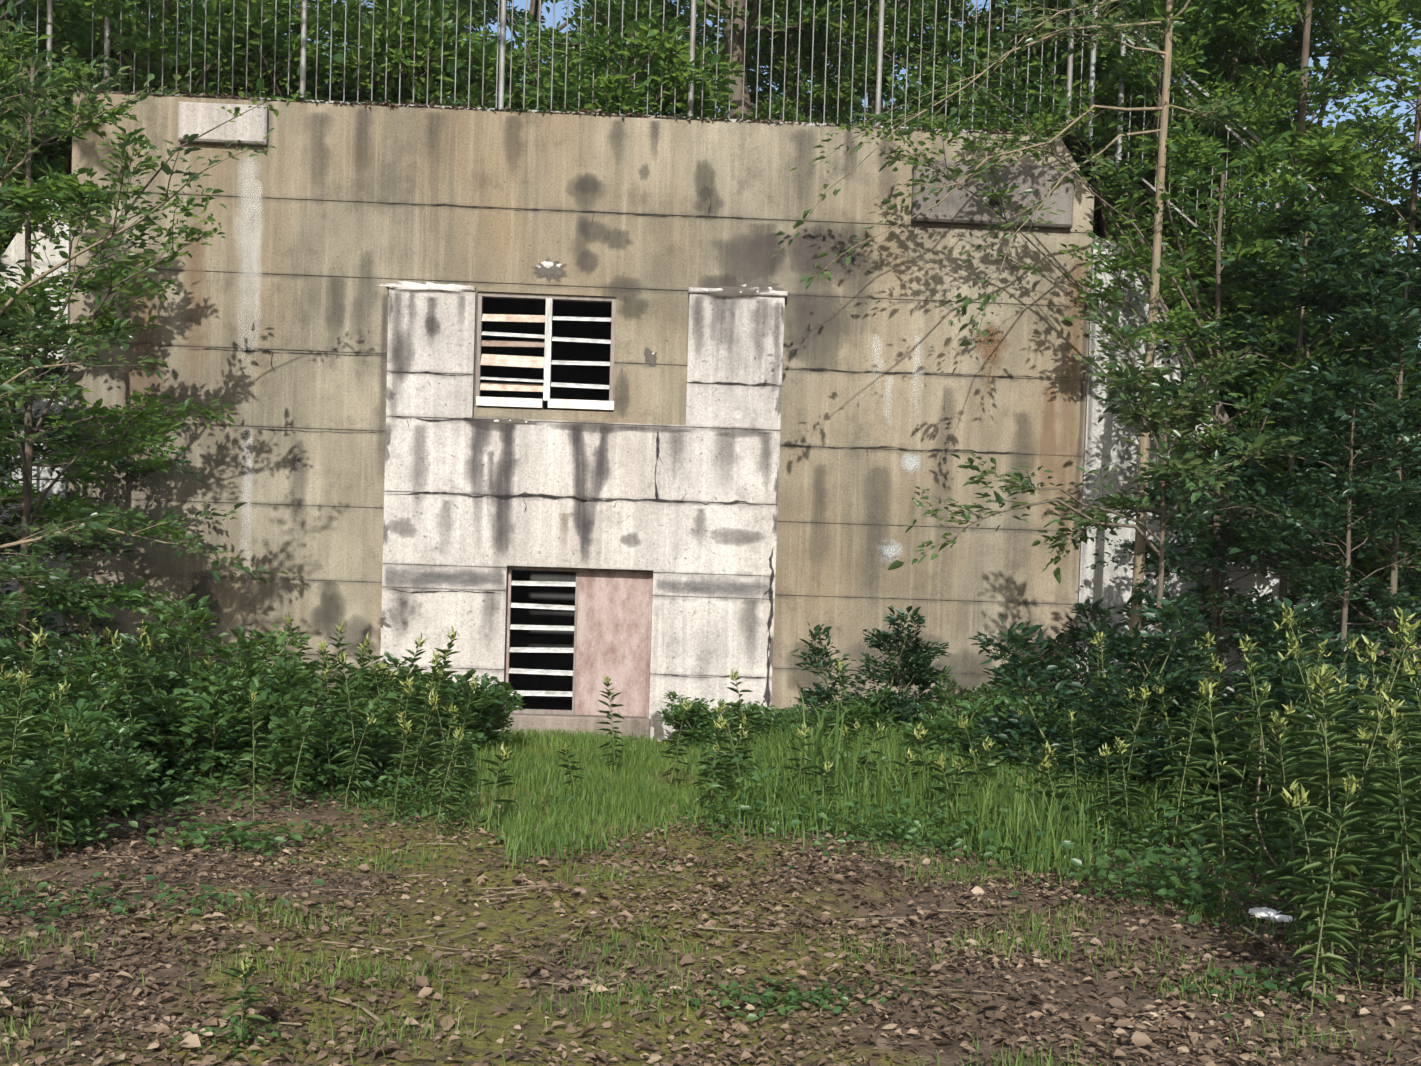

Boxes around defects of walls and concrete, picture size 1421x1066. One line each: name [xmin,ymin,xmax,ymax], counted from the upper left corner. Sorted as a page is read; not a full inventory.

spalling [534,259,566,280]
leakage [470,418,514,548]
crack [389,432,773,513]